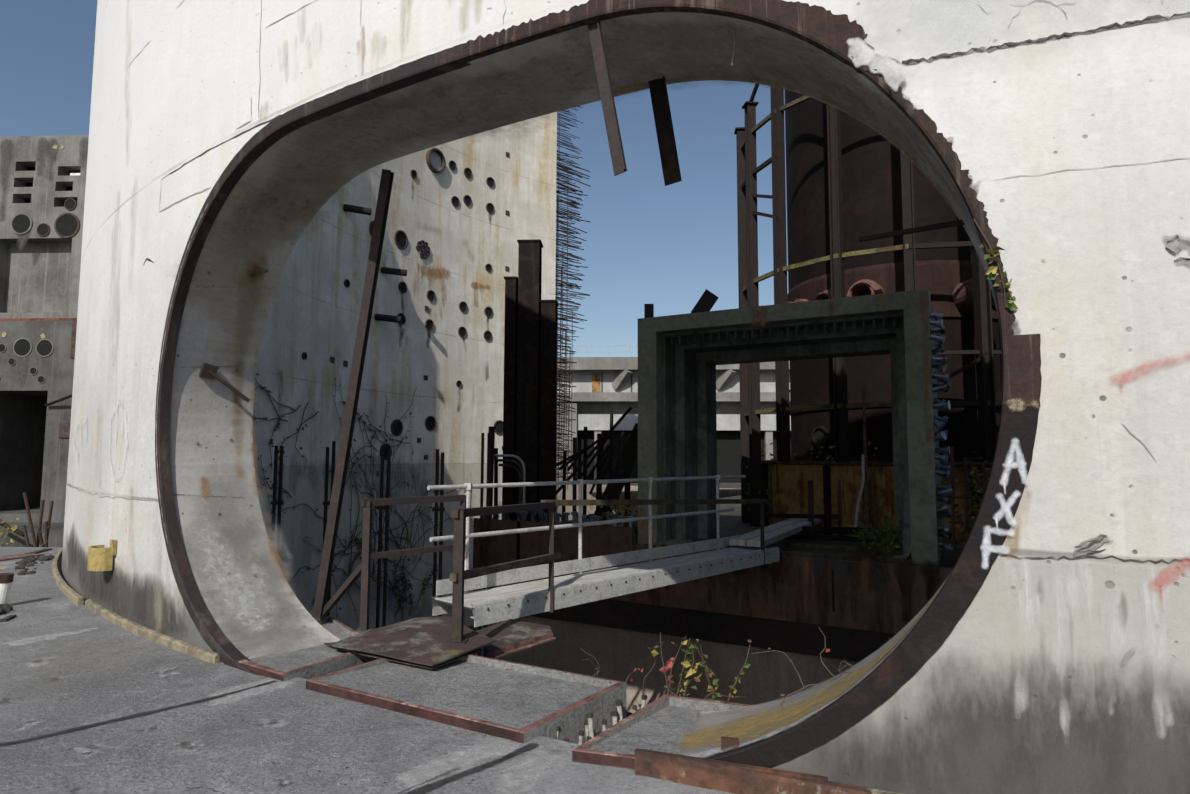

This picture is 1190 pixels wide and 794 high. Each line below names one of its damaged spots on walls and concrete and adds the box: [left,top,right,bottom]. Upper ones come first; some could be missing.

crack [862,0,1190,65]
peeling [847,38,917,106]
crack [995,158,1184,180]
spalling [1164,234,1190,266]
damp [68,530,182,634]
crack [1002,549,1190,564]